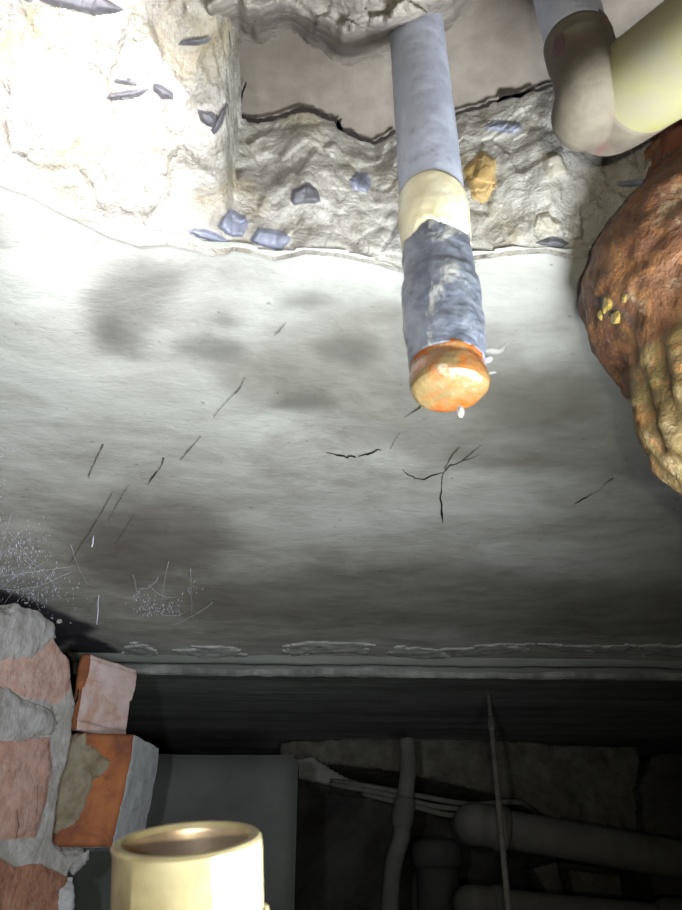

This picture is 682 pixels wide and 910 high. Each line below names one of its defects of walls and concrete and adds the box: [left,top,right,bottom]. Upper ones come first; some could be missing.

spalling [0,0,474,274]
crack [241,82,396,145]
crack [455,84,553,117]
spalling [455,87,657,261]
crack [328,406,421,459]
crack [403,445,481,522]